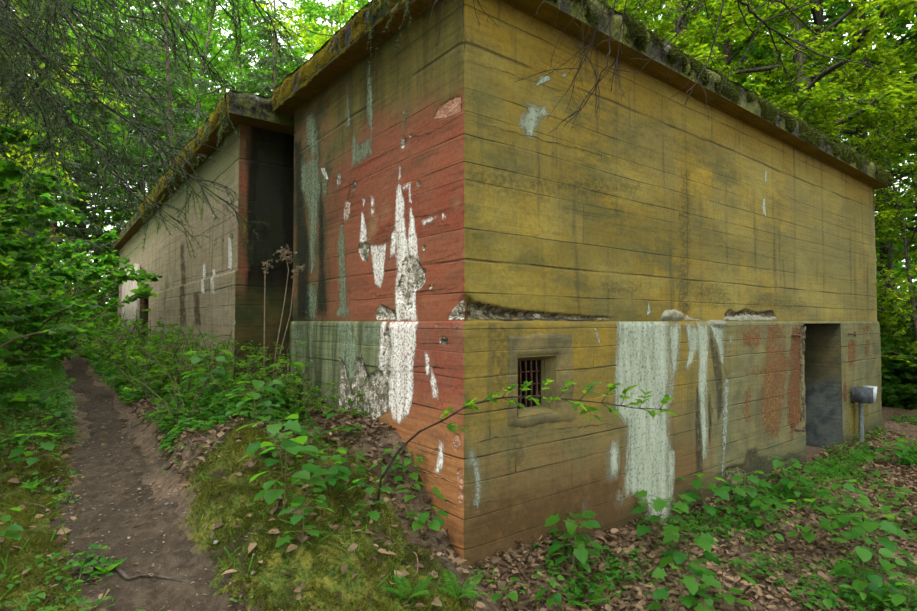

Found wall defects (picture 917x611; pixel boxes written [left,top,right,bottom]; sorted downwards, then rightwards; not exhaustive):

damp [346,63,373,166]
damp [247,111,446,423]
spalling [338,242,433,420]
spalling [448,297,610,328]
rust [743,326,801,438]